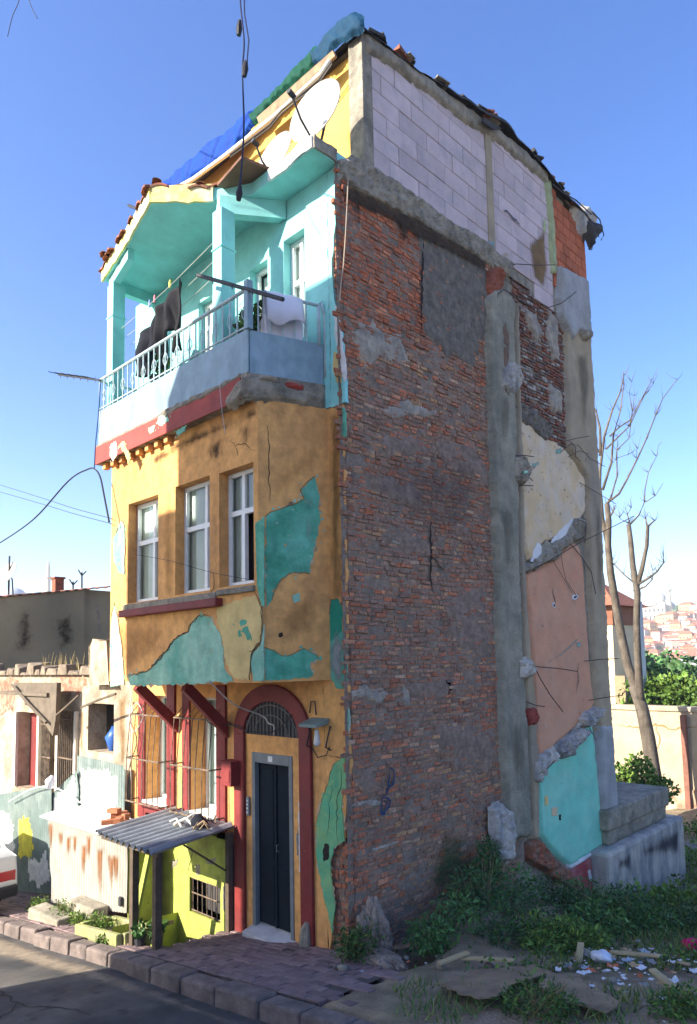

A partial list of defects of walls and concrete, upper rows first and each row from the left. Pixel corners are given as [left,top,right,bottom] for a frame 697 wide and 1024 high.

spalling [148,373,323,438]
spalling [502,323,605,467]
crack [232,427,271,493]
spalling [514,454,535,489]
peeling [110,475,348,689]
crack [429,522,443,591]
corrosion [49,825,118,879]
peeling [315,757,350,933]